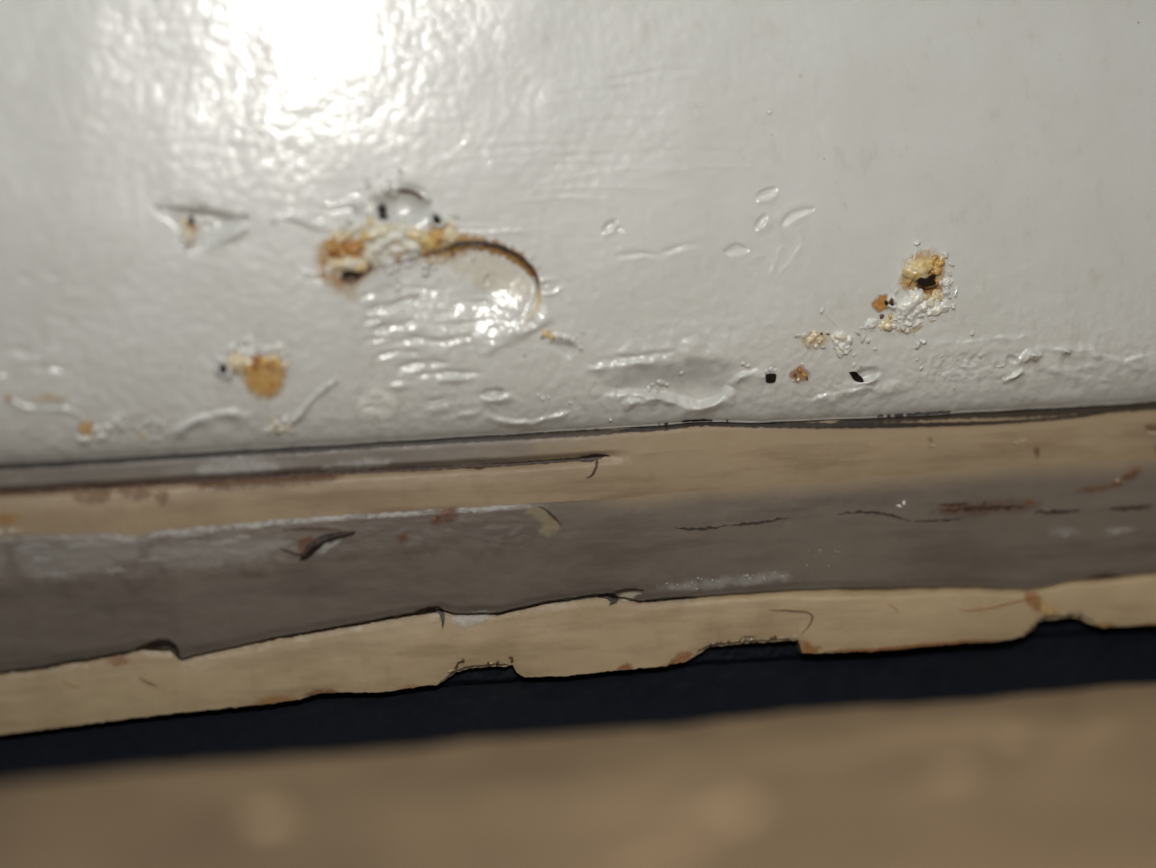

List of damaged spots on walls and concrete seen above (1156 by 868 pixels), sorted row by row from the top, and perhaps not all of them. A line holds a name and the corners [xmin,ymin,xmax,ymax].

corrosion [790,363,808,382]
peeling [1018,612,1111,638]
peeling [682,635,818,665]
peeling [439,656,526,686]